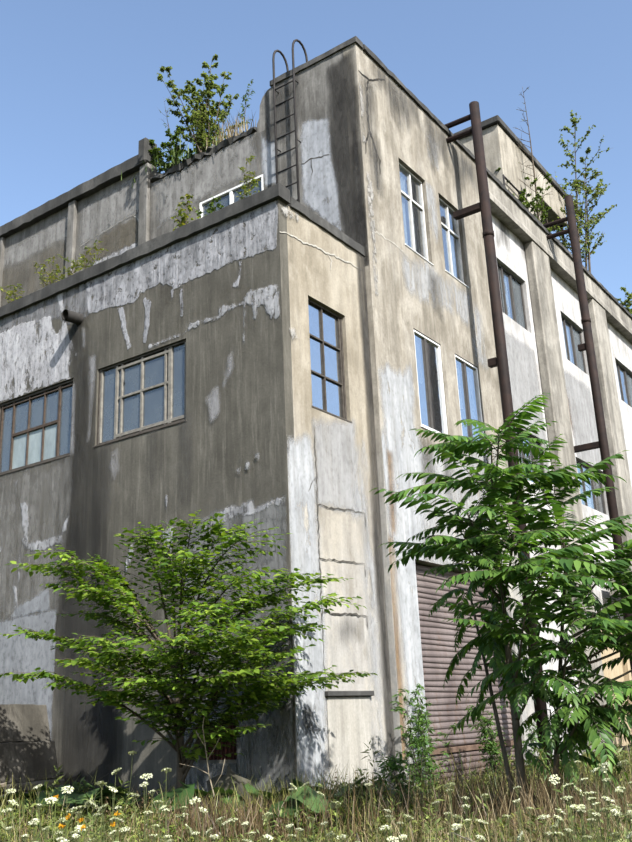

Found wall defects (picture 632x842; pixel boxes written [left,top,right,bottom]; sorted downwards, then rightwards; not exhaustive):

crack [359,71,384,190]
leakage [378,71,415,120]
peeling [86,200,298,350]
peeling [0,293,77,402]
leakage [328,55,397,776]
peeling [13,555,49,618]
peeling [20,502,68,552]
crack [309,429,368,689]